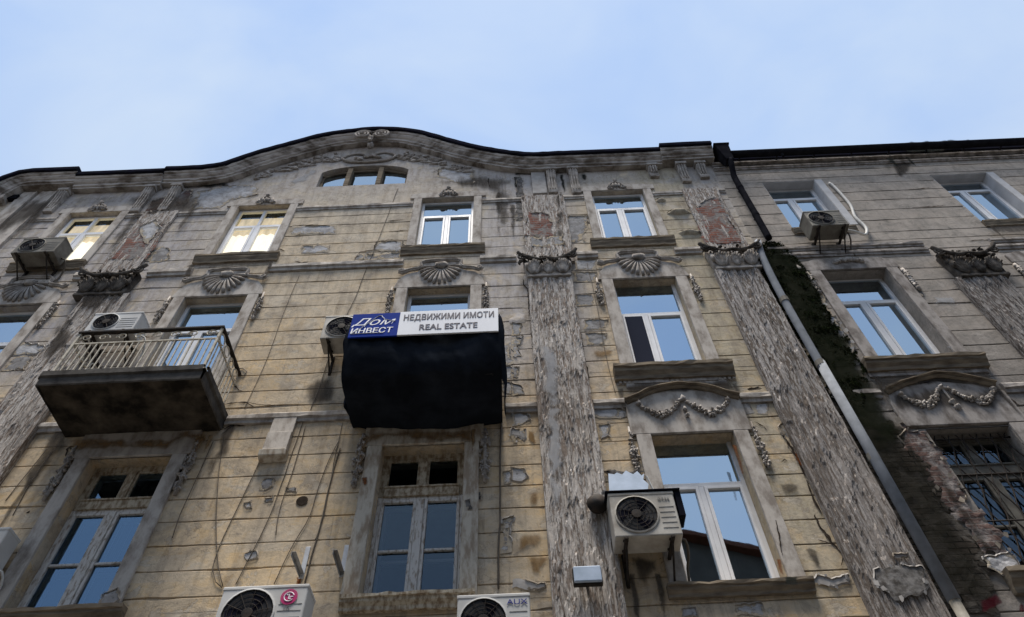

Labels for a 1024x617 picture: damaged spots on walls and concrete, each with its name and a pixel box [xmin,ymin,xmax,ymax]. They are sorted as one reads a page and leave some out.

flaking render [109,196,171,263]
flaking render [290,225,337,253]
flaking render [354,240,405,261]
damp [459,173,527,229]
flaking render [514,177,590,248]
flaking render [692,197,744,244]
flaking render [502,322,525,396]
flaking render [502,466,529,485]
flaking render [831,398,1020,617]